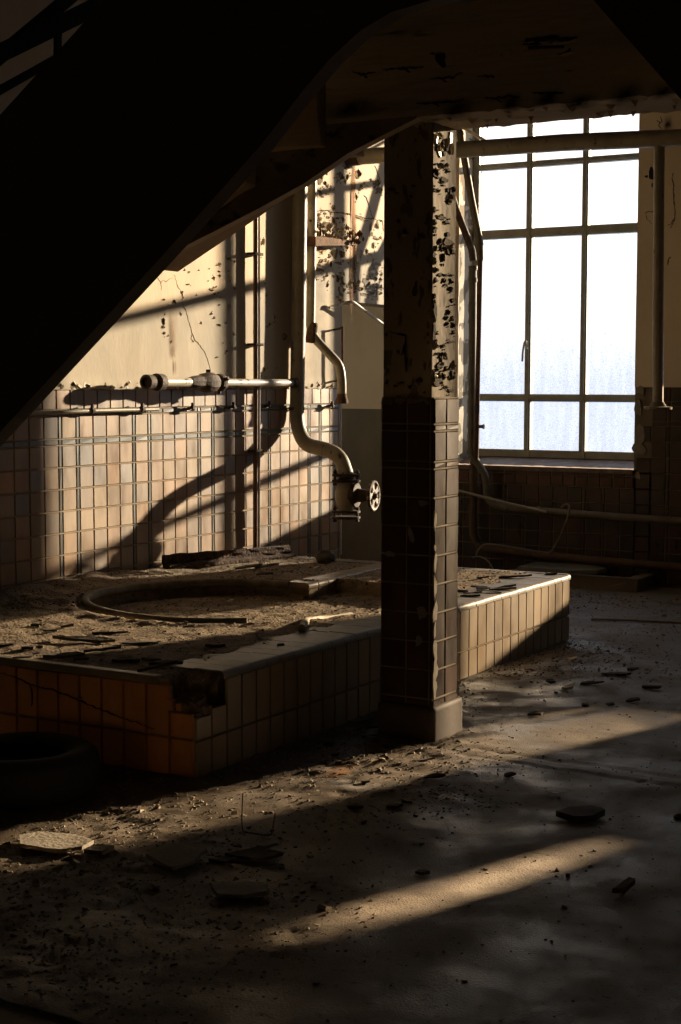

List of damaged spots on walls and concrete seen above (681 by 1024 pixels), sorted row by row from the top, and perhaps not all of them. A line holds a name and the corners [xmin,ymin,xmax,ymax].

crack [158,275,210,366]
peeling [316,166,416,303]
spalling [385,111,512,395]
crack [0,673,155,729]